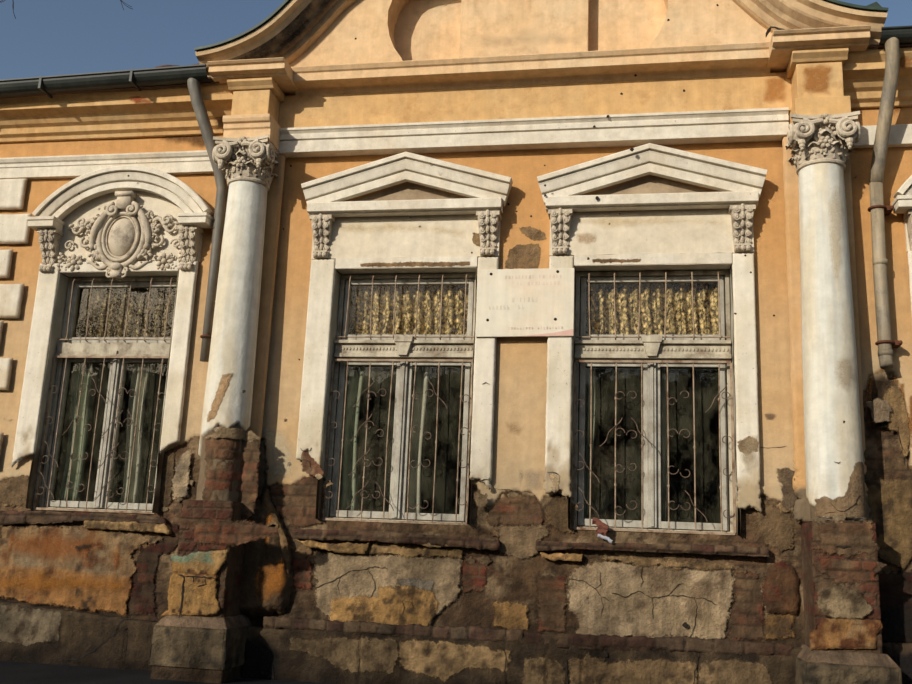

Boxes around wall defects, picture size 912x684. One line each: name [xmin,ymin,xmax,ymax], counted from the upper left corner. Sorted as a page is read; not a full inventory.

leakage [230,0,335,60]
peeling [505,215,547,269]
spalling [153,373,334,546]
peeling [737,436,760,454]
spalling [0,475,31,512]
spalling [474,473,578,559]
spalling [127,524,179,616]
crack [317,566,385,596]
spalling [461,556,492,592]
spalling [811,461,912,643]
crack [573,566,716,684]